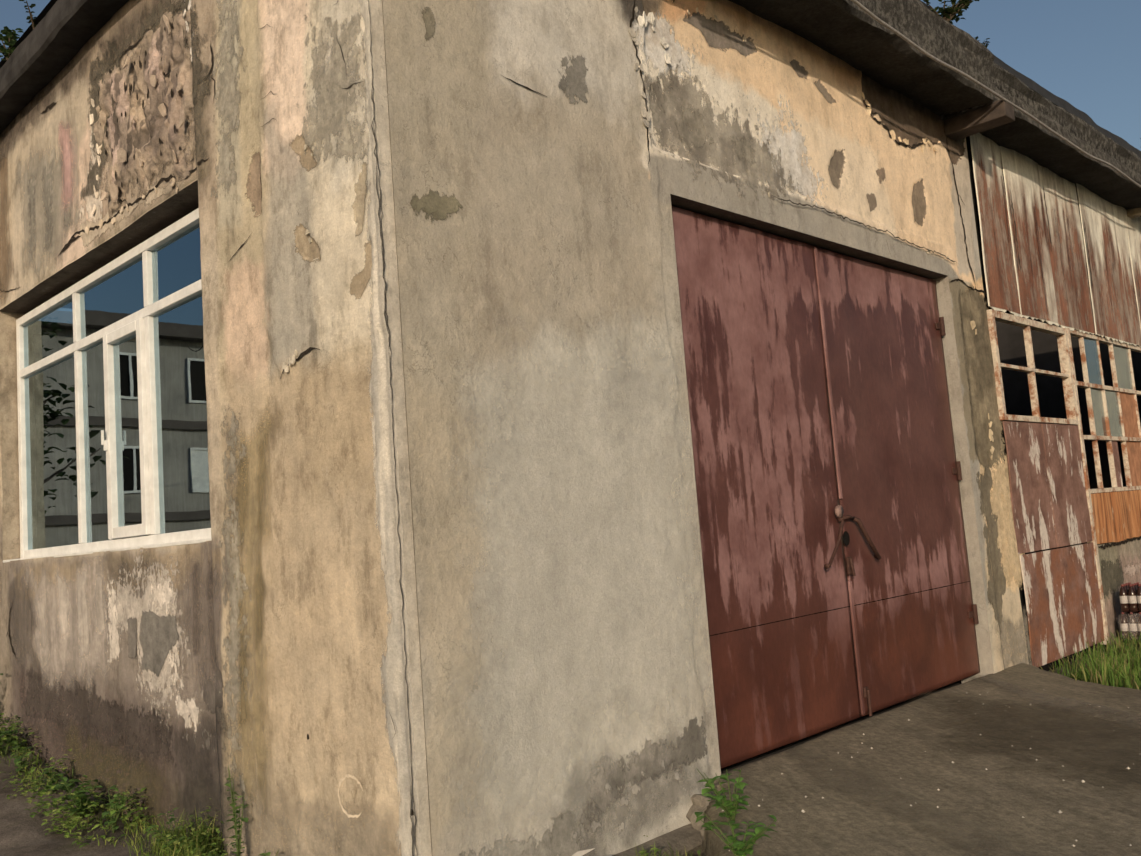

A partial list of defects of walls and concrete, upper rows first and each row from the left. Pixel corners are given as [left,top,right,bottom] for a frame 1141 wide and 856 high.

spalling [79,99,184,248]
crack [58,150,210,256]
spalling [291,135,317,171]
spalling [294,223,321,262]
spalling [350,162,372,299]
flaking render [632,7,845,213]
rust [977,156,1141,346]
peeling [106,549,215,753]
damp [9,406,383,856]
damp [459,716,708,856]